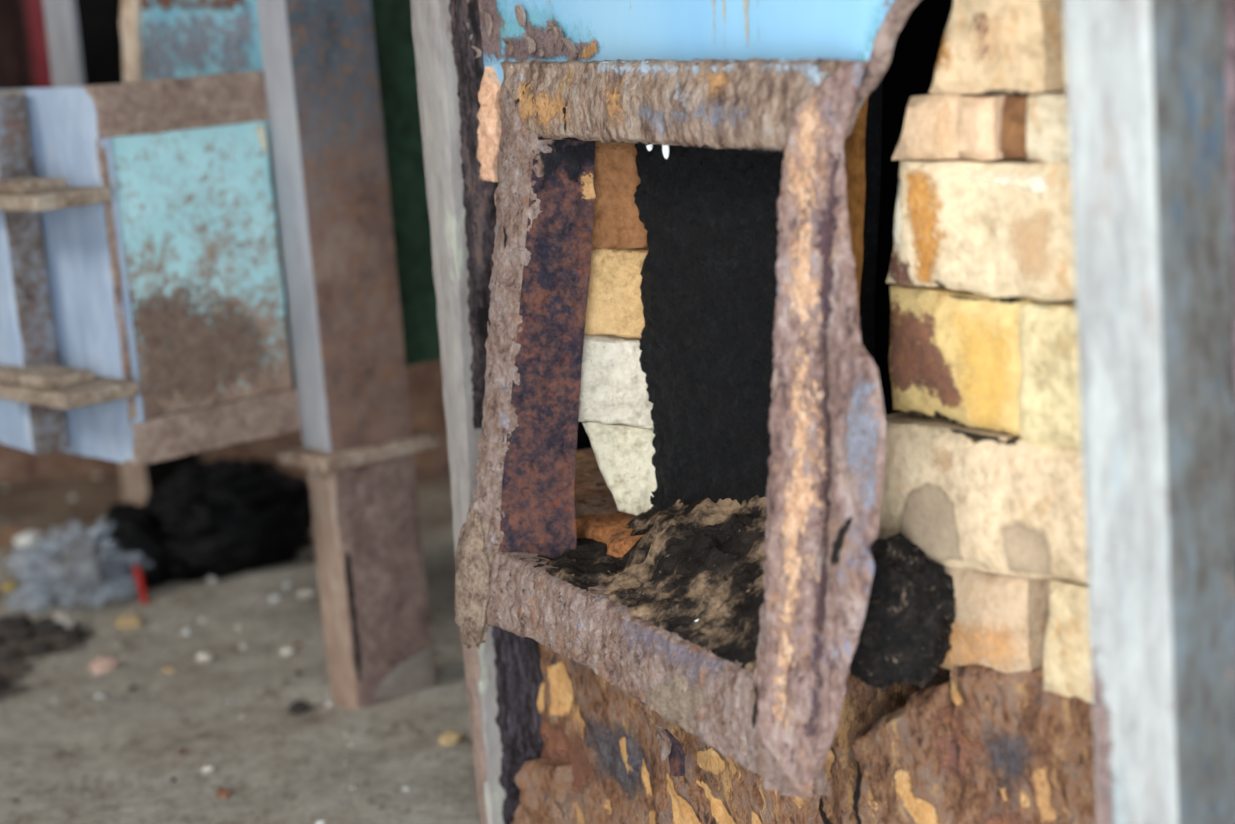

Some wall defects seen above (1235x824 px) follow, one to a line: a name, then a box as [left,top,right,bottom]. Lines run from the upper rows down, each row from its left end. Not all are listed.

rust [140,0,257,80]
rust [512,79,573,136]
rust [603,59,747,136]
peeling [759,59,825,85]
rust [581,173,596,199]
peeling [449,0,738,429]
rust [131,286,273,418]
rust [773,91,841,736]
spalling [537,661,586,734]
rust [461,621,721,824]
spalling [619,737,656,824]
spalling [666,747,735,824]